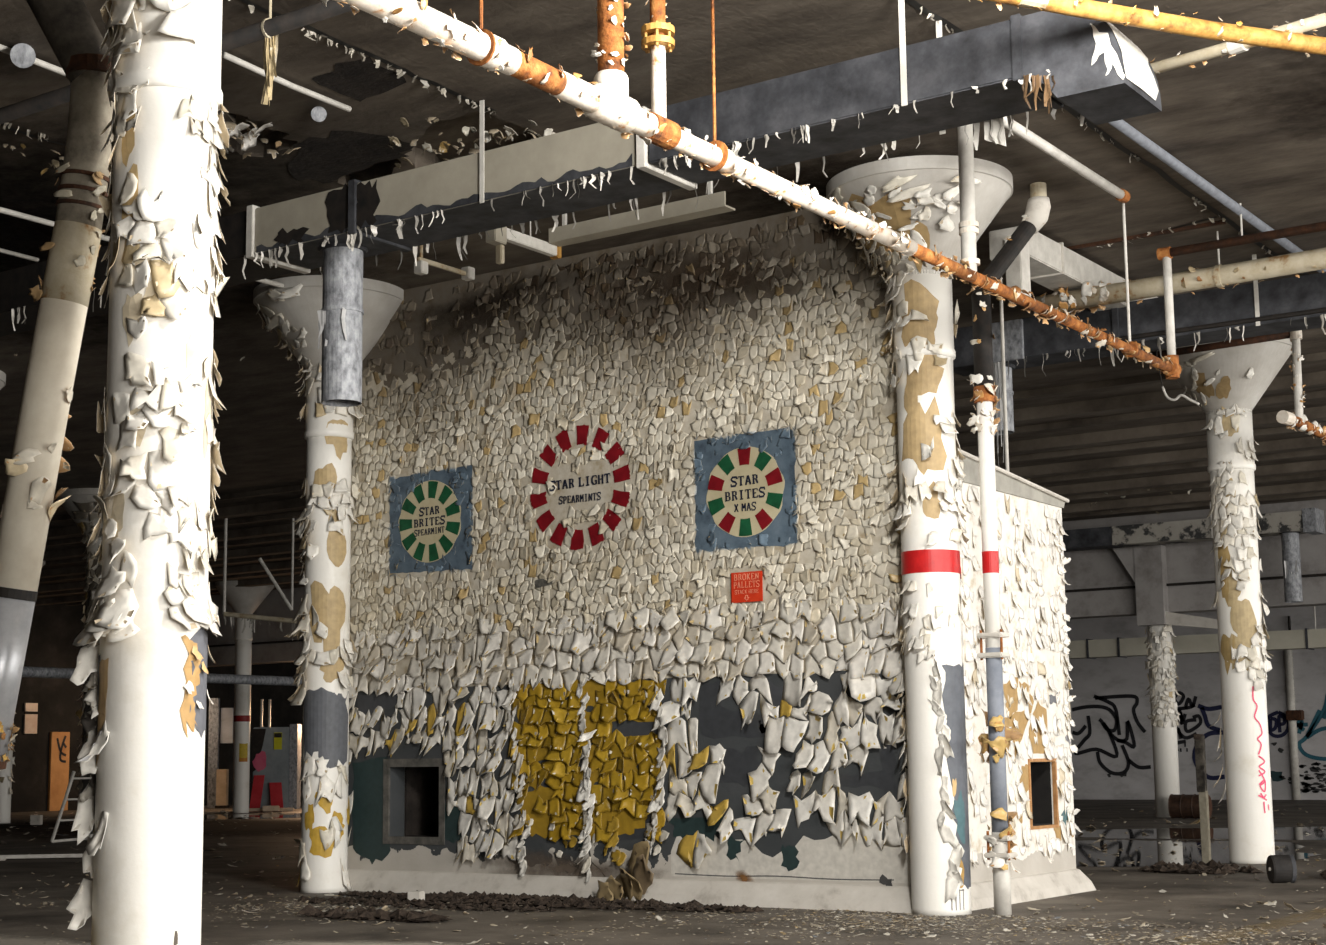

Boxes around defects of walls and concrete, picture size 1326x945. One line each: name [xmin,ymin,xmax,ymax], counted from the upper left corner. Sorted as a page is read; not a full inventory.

peeling [0,712,20,794]
peeling [4,0,555,930]
peeling [256,111,1273,903]